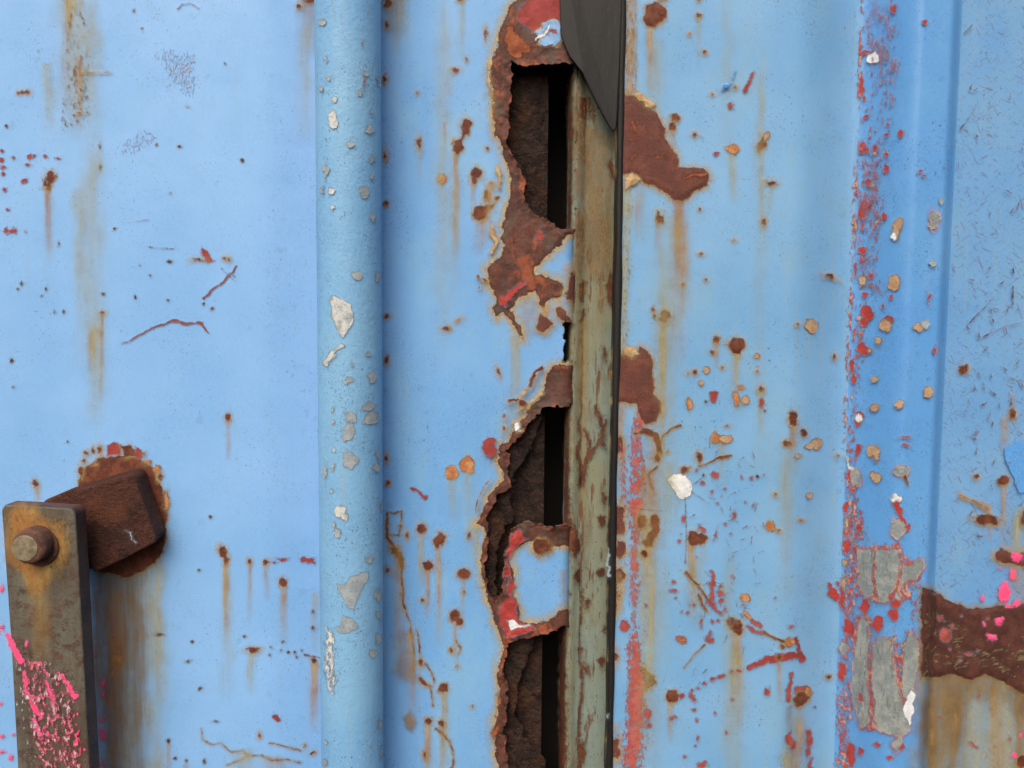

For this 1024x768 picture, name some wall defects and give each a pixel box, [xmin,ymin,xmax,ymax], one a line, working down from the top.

rust [437,118,472,198]
rust [470,165,501,254]
peeling [321,295,354,367]
peeling [797,319,819,334]
rust [535,0,711,768]
peeling [825,0,926,768]
peeling [322,400,380,478]
peeling [794,428,823,460]
rust [77,441,170,578]
peeling [337,555,381,633]
rust [778,664,814,708]
rust [918,586,1024,768]